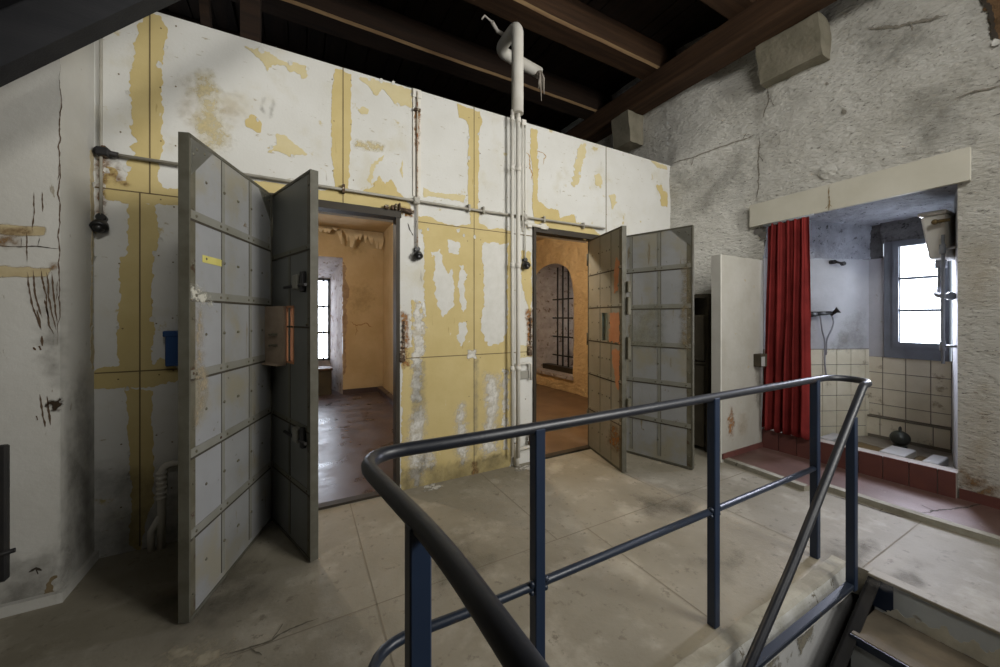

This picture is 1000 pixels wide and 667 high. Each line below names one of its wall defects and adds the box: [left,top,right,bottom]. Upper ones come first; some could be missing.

crack [867,14,949,31]
peeling [245,46,309,79]
peeling [245,114,262,133]
peeling [267,133,307,158]
crack [669,88,774,195]
peeling [254,181,285,193]
peeling [318,69,533,490]
corrosion [27,265,57,350]
corrosion [36,396,62,426]
crack [828,494,981,518]